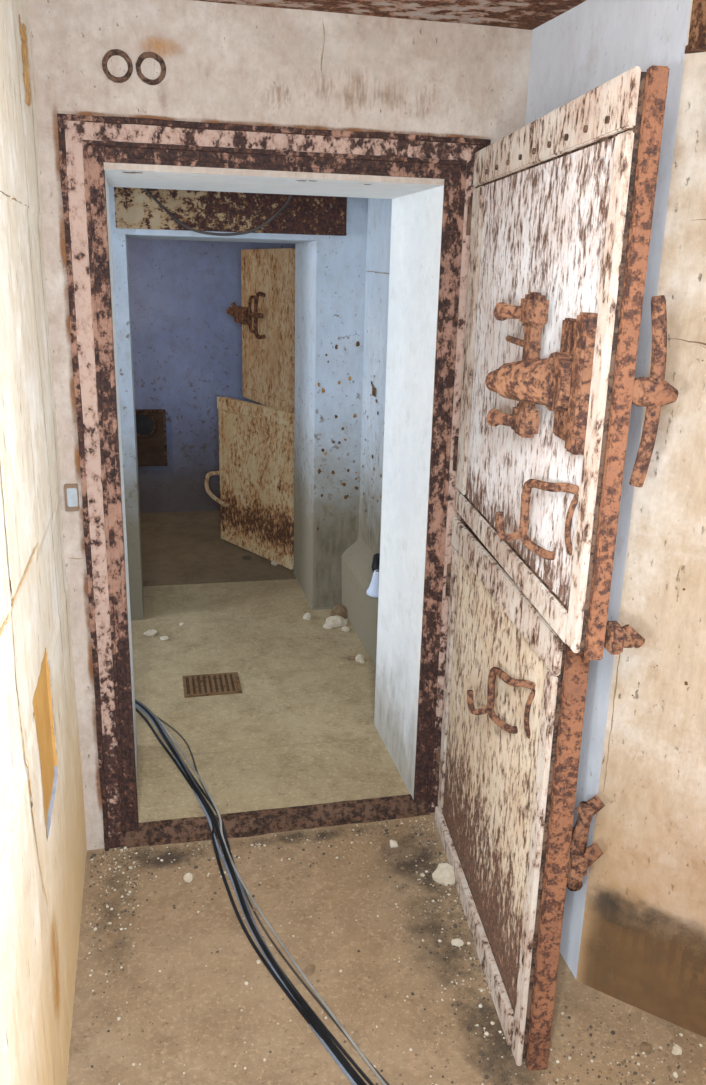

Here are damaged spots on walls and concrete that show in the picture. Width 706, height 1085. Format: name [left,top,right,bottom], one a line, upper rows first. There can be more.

rust [342,128,480,139]
leakage [586,893,706,1038]